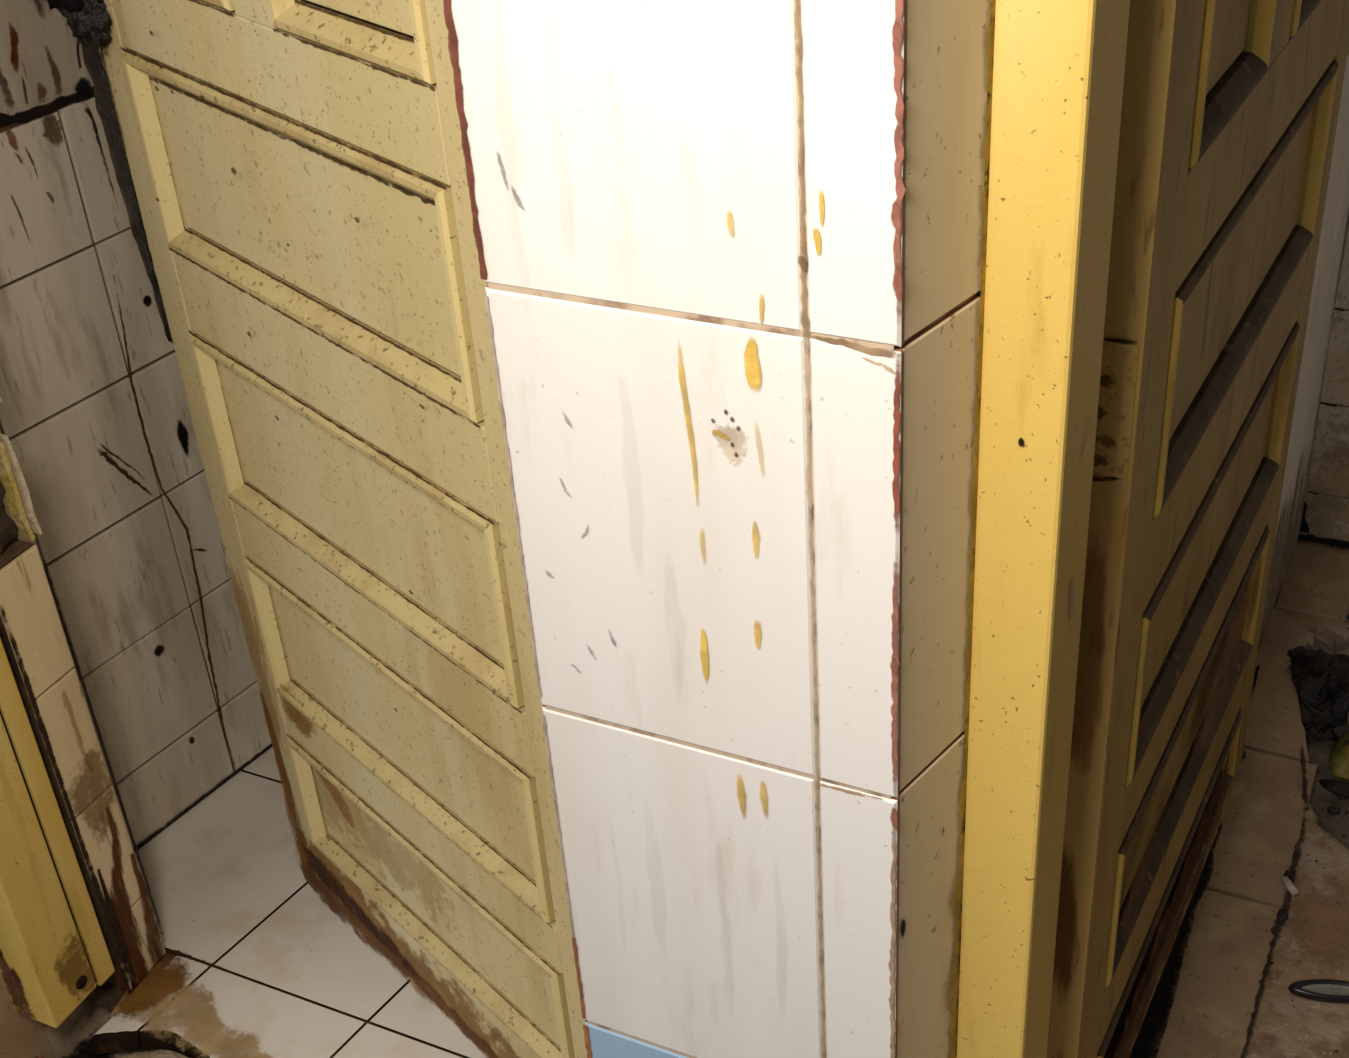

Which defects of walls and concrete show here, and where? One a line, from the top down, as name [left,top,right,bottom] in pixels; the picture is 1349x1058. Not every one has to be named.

water stain [1331,215,1349,327]
spalling [0,434,42,553]
water stain [1193,355,1349,761]
rust [1,560,168,994]